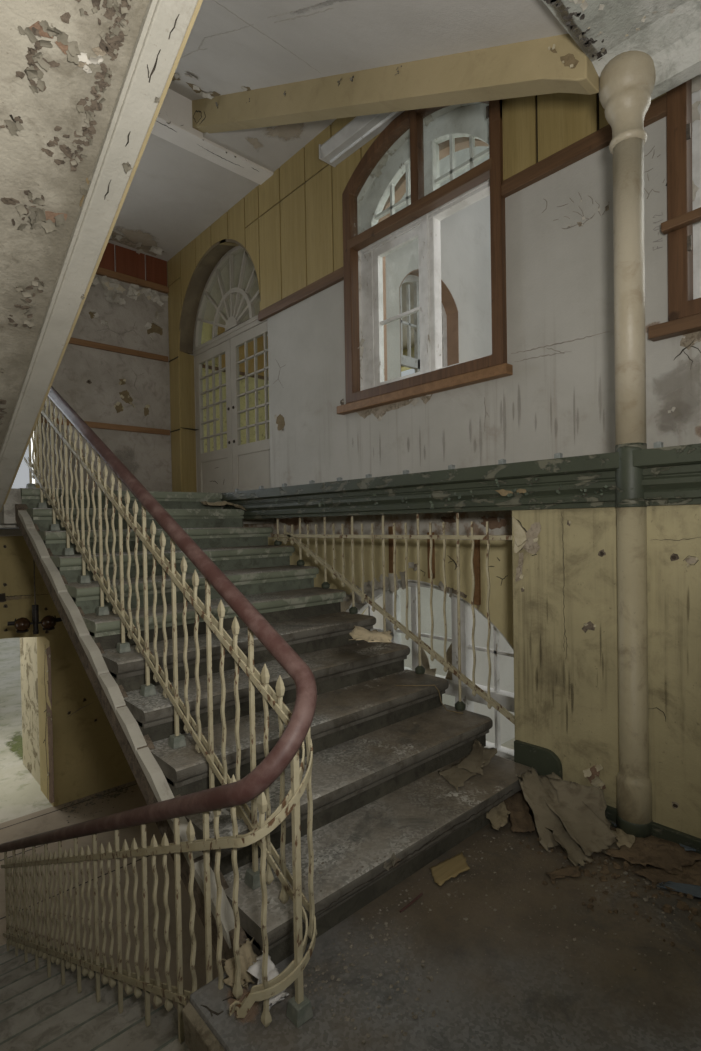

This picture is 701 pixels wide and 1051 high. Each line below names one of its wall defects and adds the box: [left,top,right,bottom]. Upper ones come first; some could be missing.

crack [147,0,356,83]
peeling [548,44,579,69]
peeling [0,117,24,136]
peeling [16,0,132,207]
peeling [172,73,221,108]
peeling [8,277,45,329]
peeling [81,275,168,341]
peeling [274,414,285,431]
peeling [276,517,313,527]
flaking render [477,514,541,592]